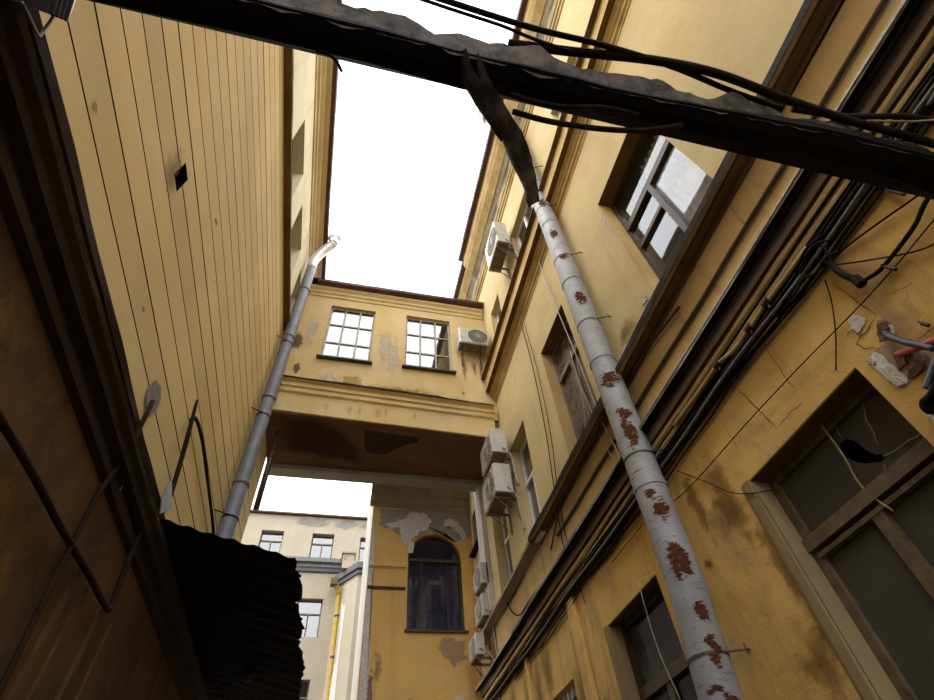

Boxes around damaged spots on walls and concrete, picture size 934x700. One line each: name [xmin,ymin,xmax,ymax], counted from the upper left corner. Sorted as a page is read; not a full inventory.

peeling [848,314,865,332]
spalling [866,318,929,387]
rust [600,371,622,388]
crack [738,346,802,428]
water stain [290,422,356,460]
rust [616,407,640,455]
rust [644,489,670,524]
rust [666,535,694,581]
flaking render [359,509,471,700]
rust [692,600,712,621]
rust [704,634,723,669]
rust [706,684,738,700]